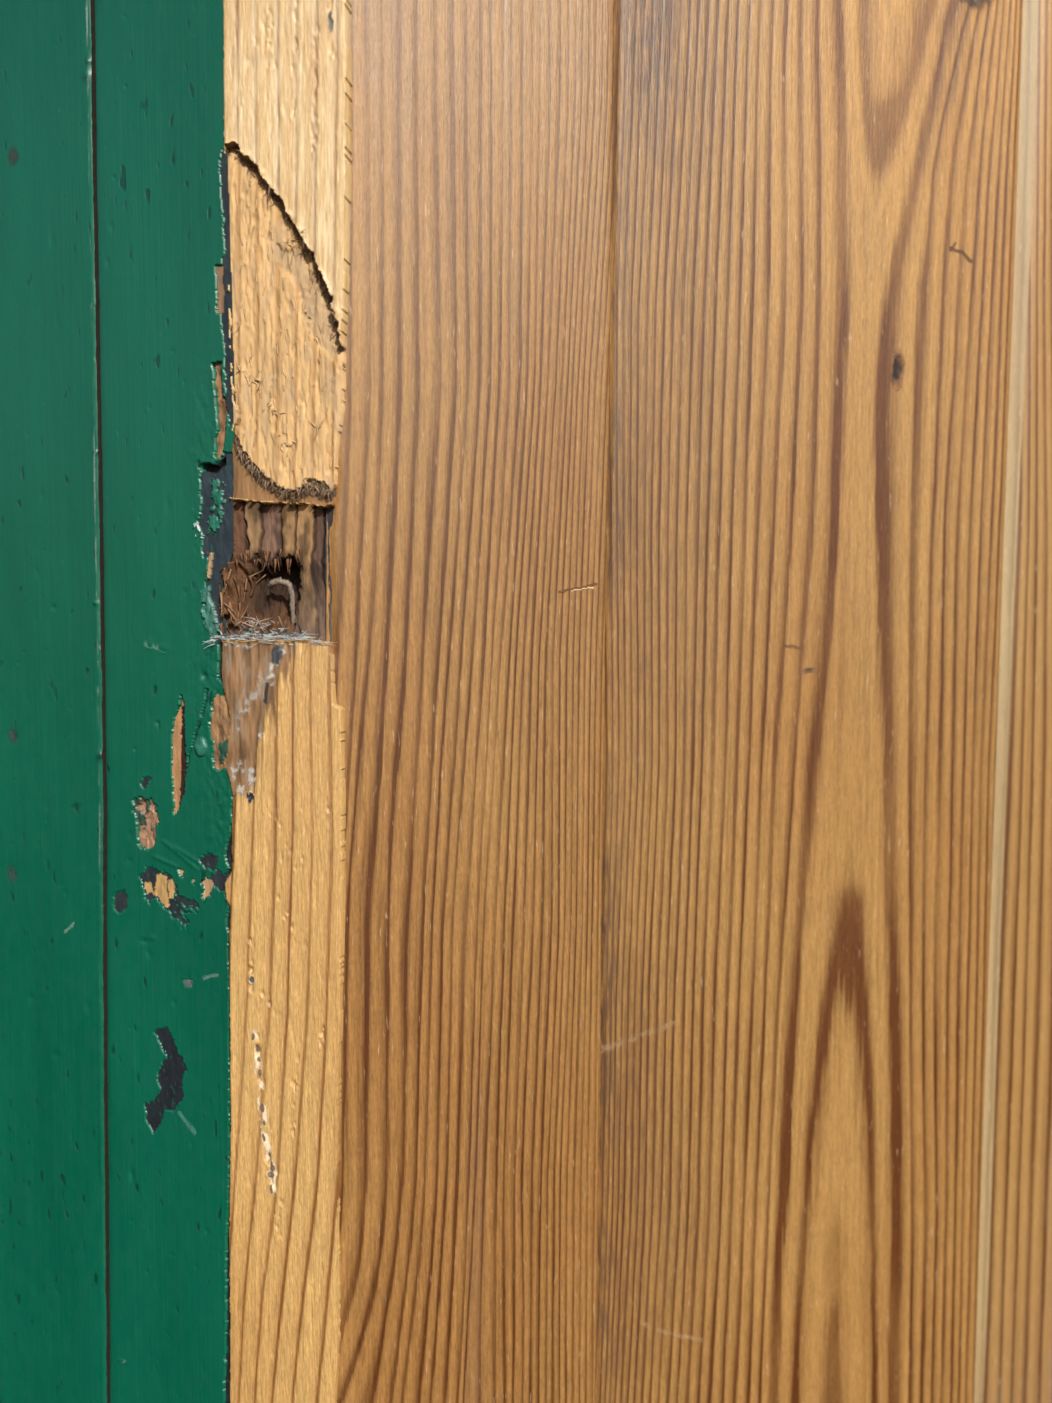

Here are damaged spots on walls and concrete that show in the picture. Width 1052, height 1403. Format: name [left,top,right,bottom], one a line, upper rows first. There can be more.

spalling [193,141,347,771]
spalling [133,699,186,849]
peeling [140,833,233,926]
peeling [145,1027,187,1133]